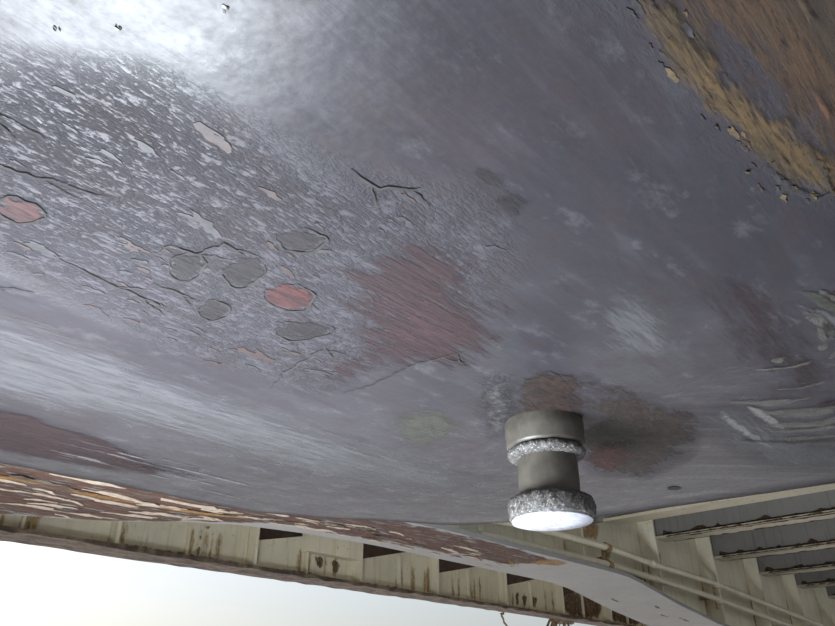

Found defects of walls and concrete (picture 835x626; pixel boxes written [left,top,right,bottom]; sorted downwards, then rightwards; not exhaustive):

peeling [52,86,78,100]
peeling [86,148,123,166]
peeling [134,138,161,158]
peeling [193,121,232,154]
peeling [257,186,283,201]
peeling [0,196,47,226]
peeling [176,209,223,239]
peeling [262,265,335,355]
damp [333,242,500,377]
damp [0,322,459,497]